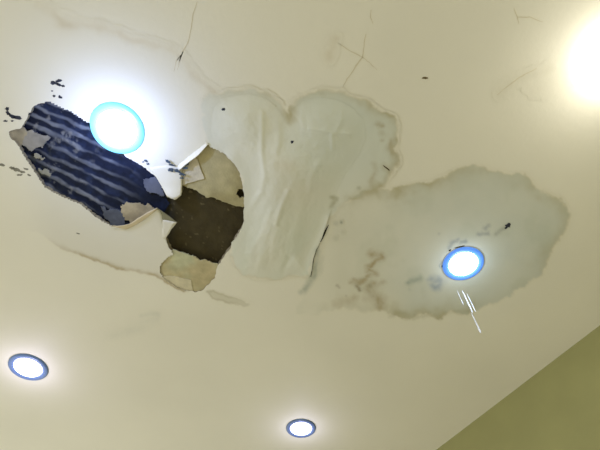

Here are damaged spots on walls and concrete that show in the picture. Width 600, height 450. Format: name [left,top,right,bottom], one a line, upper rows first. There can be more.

crack [174,3,197,70]
peeling [0,79,244,292]
damp [0,0,575,333]